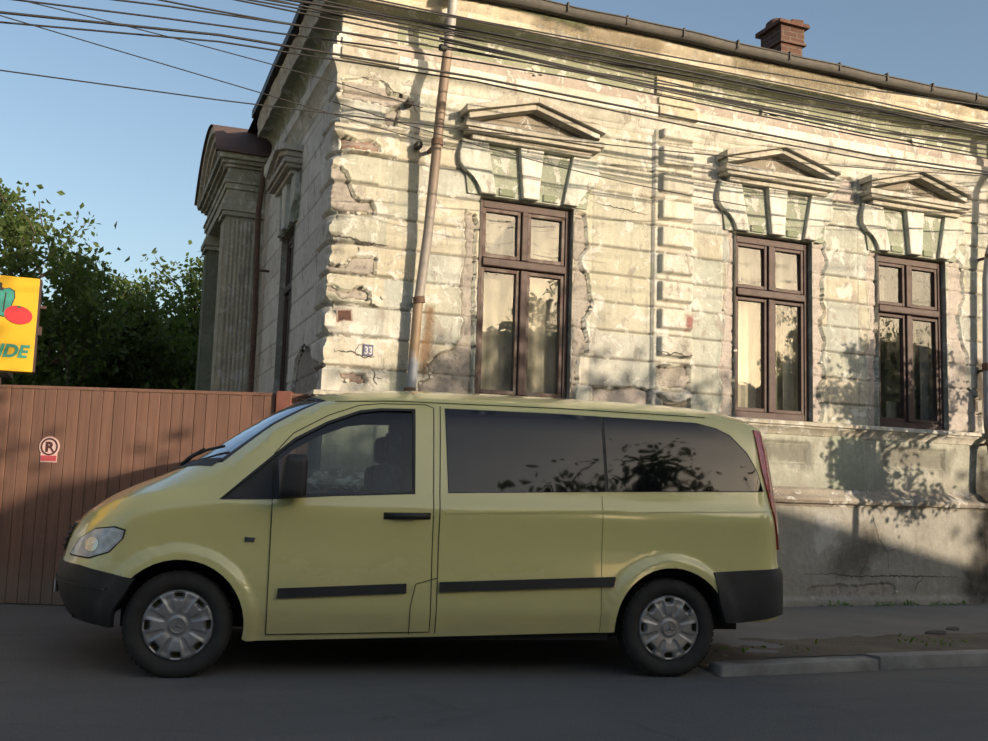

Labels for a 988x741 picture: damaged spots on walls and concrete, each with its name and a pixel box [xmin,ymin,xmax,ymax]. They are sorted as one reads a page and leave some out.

flaking render [331,168,373,215]
flaking render [326,258,386,323]
flaking render [418,213,475,393]
flaking render [289,347,323,394]
damp [810,513,842,559]